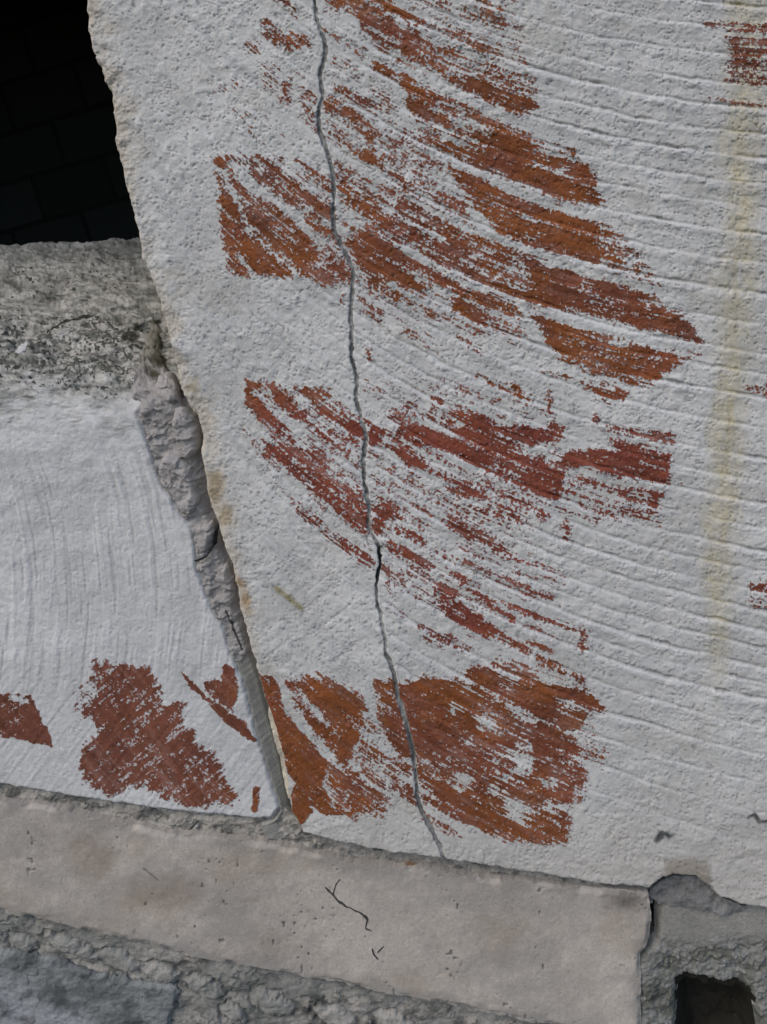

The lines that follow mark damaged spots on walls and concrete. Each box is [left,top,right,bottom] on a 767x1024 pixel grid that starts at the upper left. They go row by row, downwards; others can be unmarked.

crack [313,0,446,858]
crack [325,879,384,960]
spalling [648,874,747,915]